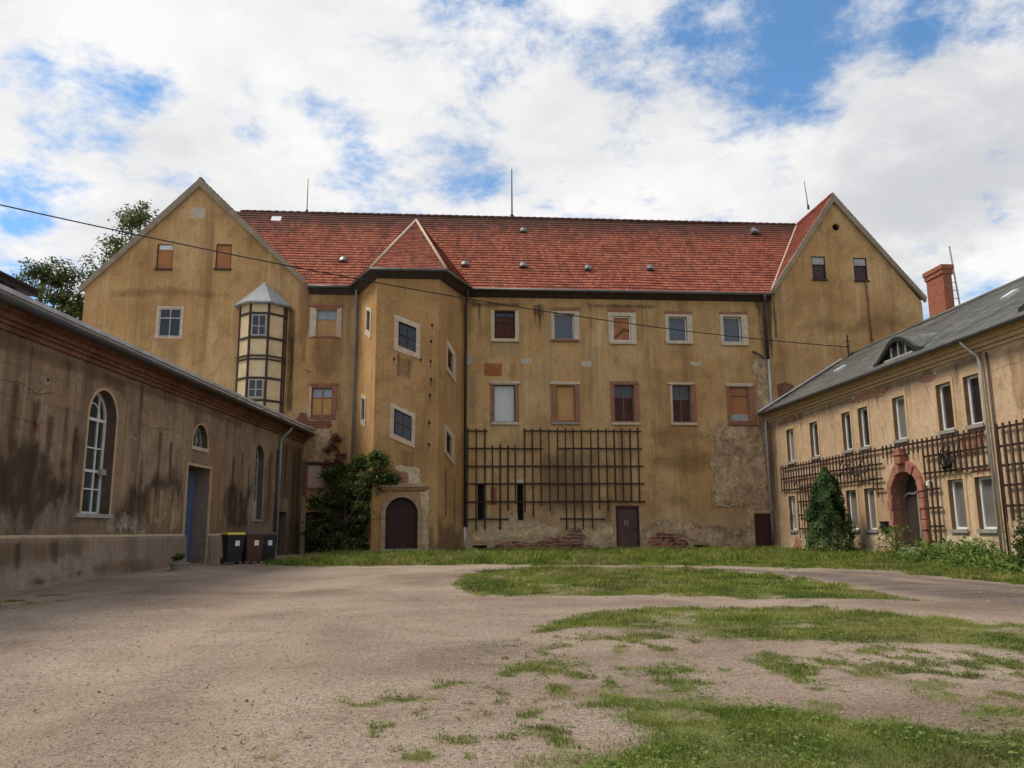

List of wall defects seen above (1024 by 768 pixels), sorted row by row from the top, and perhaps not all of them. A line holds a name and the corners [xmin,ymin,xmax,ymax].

leakage [0,387,72,564]
leakage [104,442,181,534]
flaking render [470,511,616,550]
flaking render [640,376,794,548]